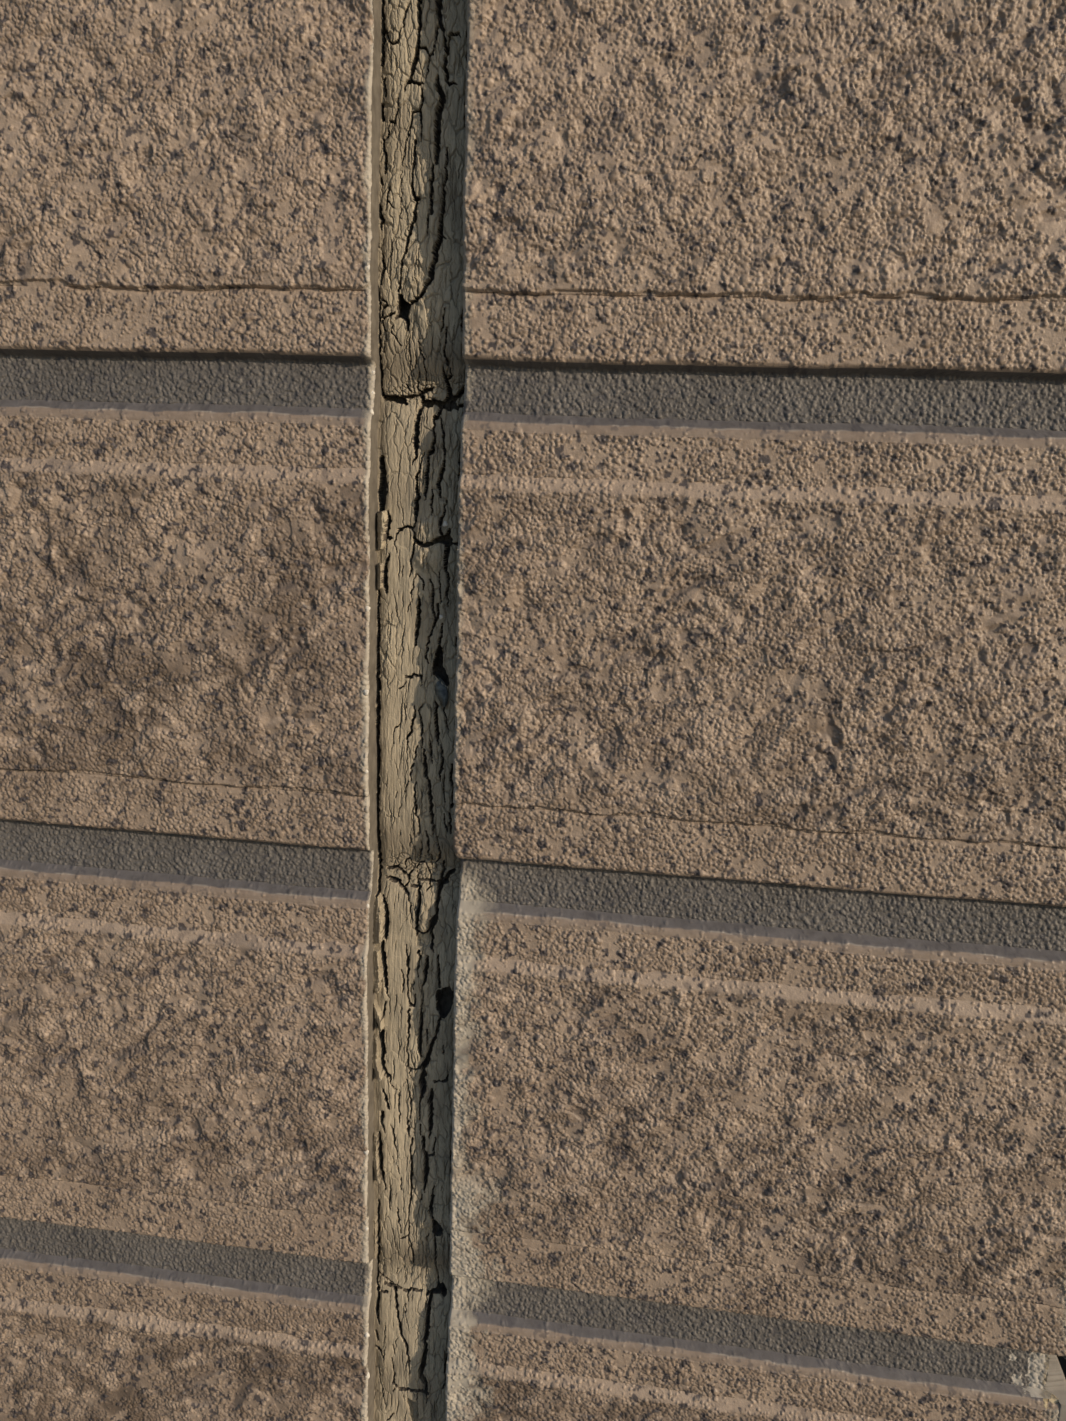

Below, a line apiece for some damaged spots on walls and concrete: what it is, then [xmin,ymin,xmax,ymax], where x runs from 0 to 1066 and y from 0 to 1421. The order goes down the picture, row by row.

crack [375,0,465,1420]